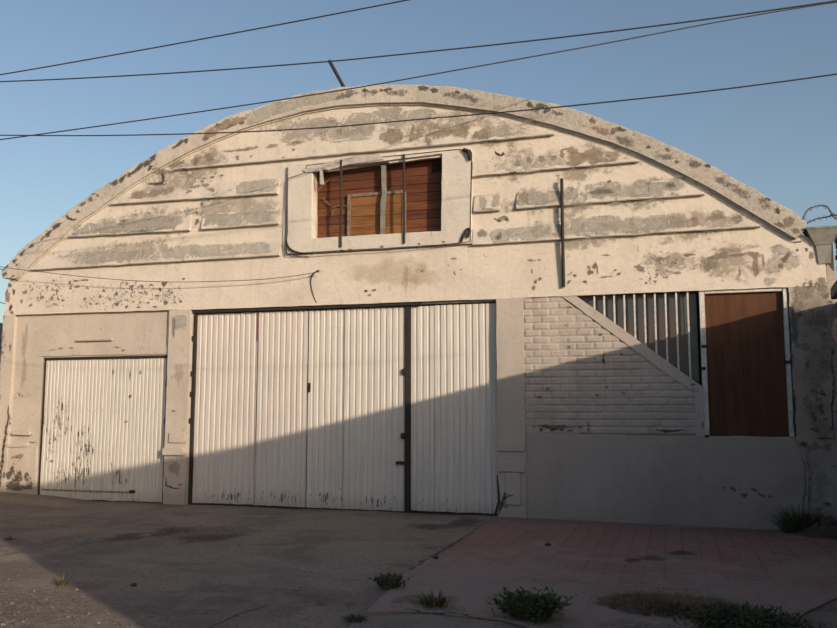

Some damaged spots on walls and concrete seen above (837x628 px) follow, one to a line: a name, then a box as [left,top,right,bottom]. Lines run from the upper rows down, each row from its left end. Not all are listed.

peeling [202,89,344,141]
peeling [590,117,632,145]
peeling [222,141,302,161]
peeling [131,187,174,199]
peeling [517,180,622,206]
peeling [478,195,687,243]
peeling [71,242,270,264]
peeling [566,254,621,284]
peeling [634,251,696,285]
spalling [772,217,814,273]
peeling [20,277,185,310]
water stain [2,466,37,491]